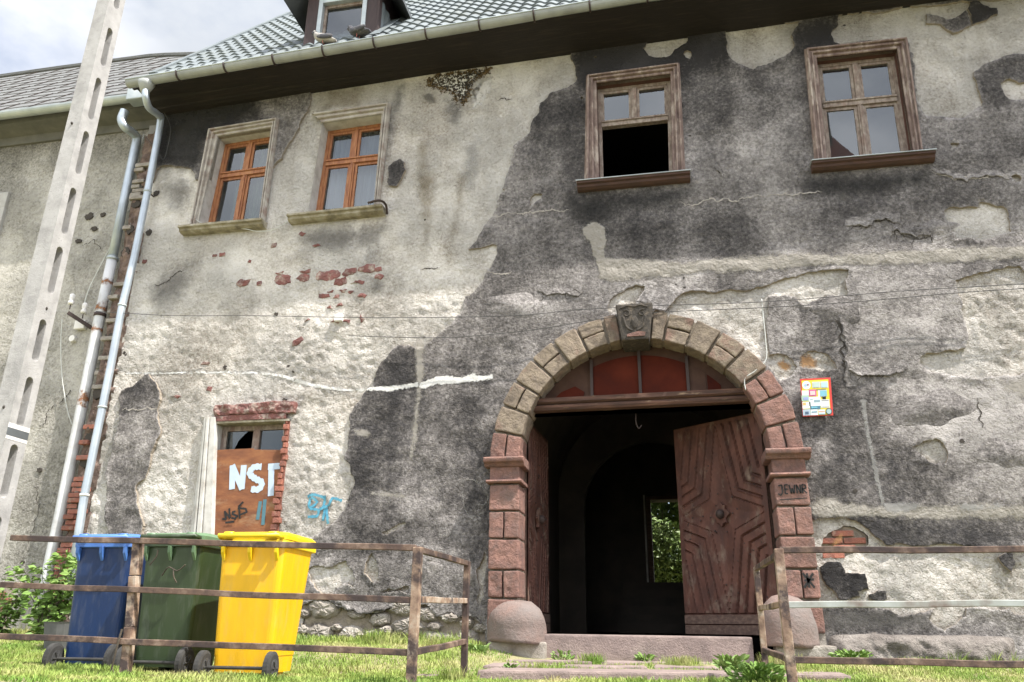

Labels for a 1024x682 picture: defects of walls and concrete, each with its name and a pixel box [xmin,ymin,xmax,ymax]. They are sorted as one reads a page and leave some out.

peeling [644,38,691,59]
peeling [726,23,798,69]
peeling [831,0,1024,119]
crack [682,167,820,206]
peeling [930,165,1020,183]
crack [848,220,933,244]
peeling [944,203,1010,241]
peeling [47,55,583,622]
peeling [608,267,1024,387]
crack [835,319,884,387]
peeling [912,439,947,464]
peeling [812,517,1024,630]